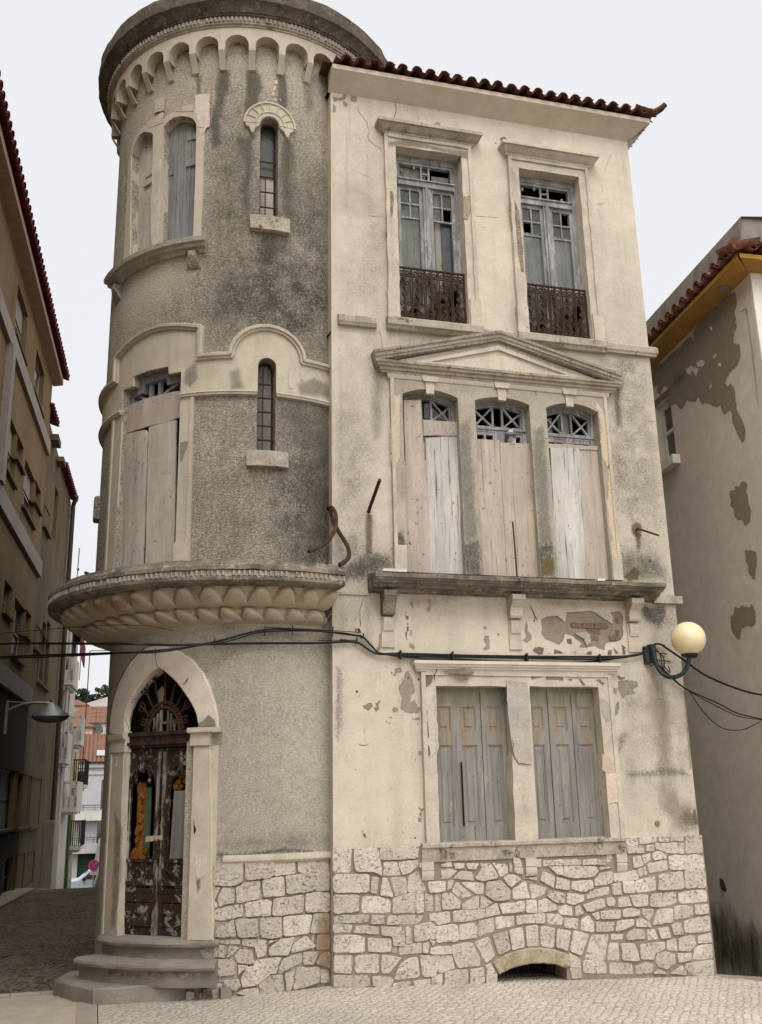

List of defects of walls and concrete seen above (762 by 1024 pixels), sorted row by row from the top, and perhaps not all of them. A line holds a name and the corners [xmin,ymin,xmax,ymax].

damp [211,71,229,146]
damp [245,72,261,111]
damp [278,76,287,108]
flaking render [651,292,746,443]
flaking render [729,481,752,525]
flaking render [745,549,757,580]
spalling [522,611,626,655]
flaking render [730,604,756,639]
peeling [386,667,475,760]
peeling [506,676,638,764]
damp [713,911,762,977]